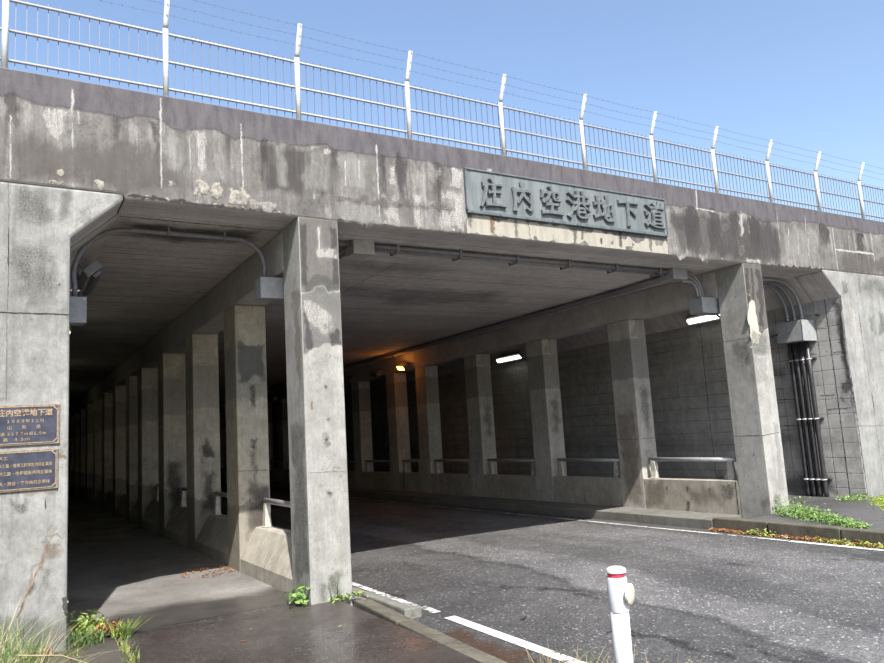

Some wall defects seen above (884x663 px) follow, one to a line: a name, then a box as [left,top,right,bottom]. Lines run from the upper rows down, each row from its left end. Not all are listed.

spalling [126,180,294,216]
leakage [0,68,884,383]
crack [5,182,70,400]
peeling [747,294,763,348]
crack [19,532,60,614]